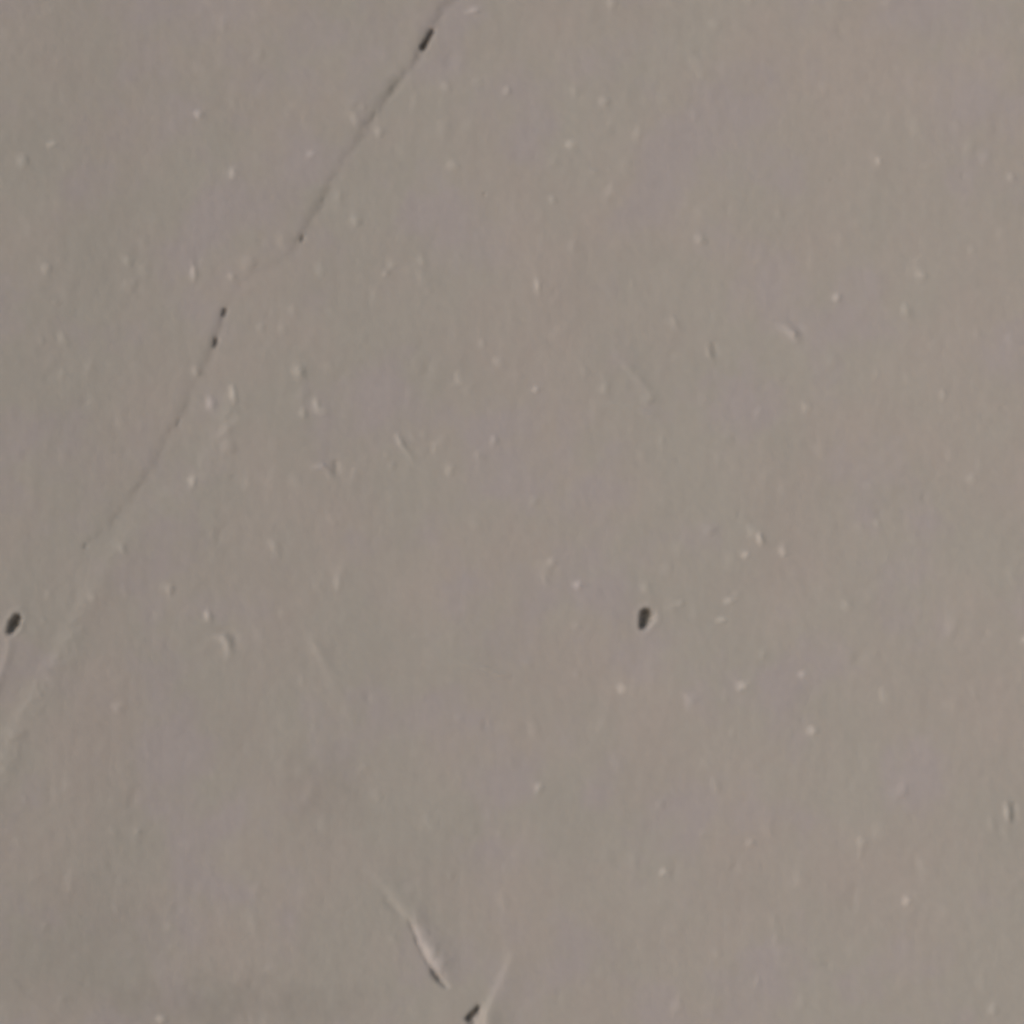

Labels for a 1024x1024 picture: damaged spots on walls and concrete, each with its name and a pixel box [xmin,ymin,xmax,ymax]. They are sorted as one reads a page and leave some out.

crack [77,0,464,554]